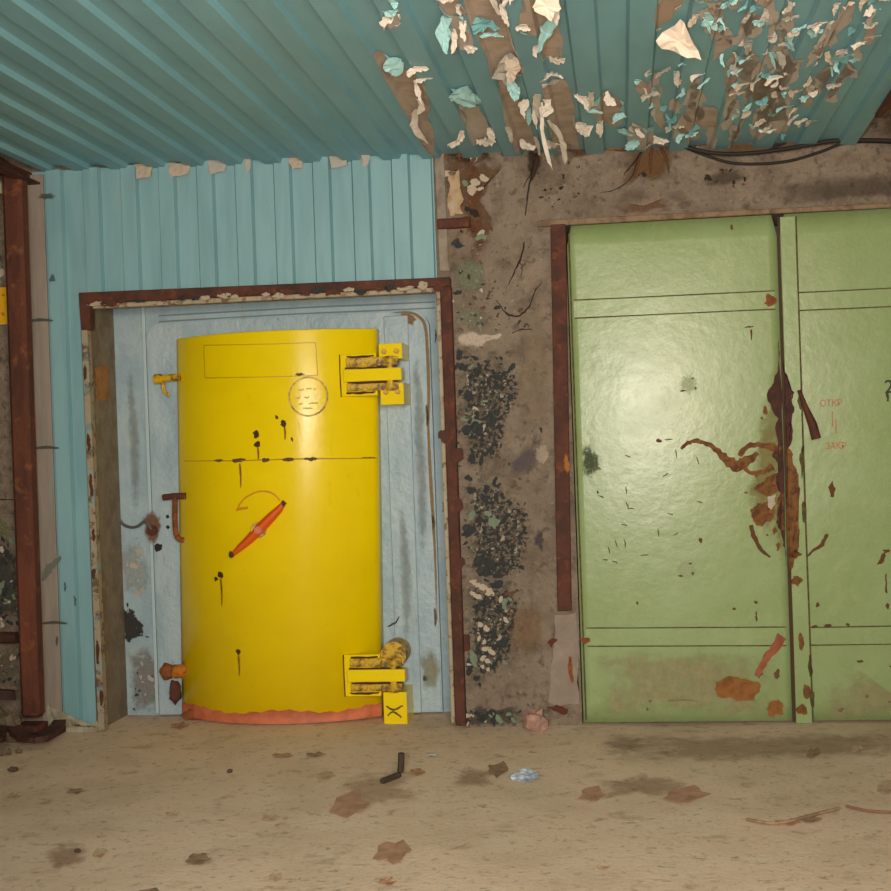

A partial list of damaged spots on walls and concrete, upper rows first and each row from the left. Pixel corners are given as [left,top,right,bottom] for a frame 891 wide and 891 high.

peeling [379,0,401,30]
peeling [373,51,435,157]
peeling [435,0,889,207]
flaking render [447,169,484,216]
rust [80,281,444,307]
rust [339,355,398,397]
rust [253,430,269,462]
rust [395,311,465,594]
damp [514,451,536,471]
rust [680,342,828,586]
rust [343,655,402,697]
rust [715,633,786,701]